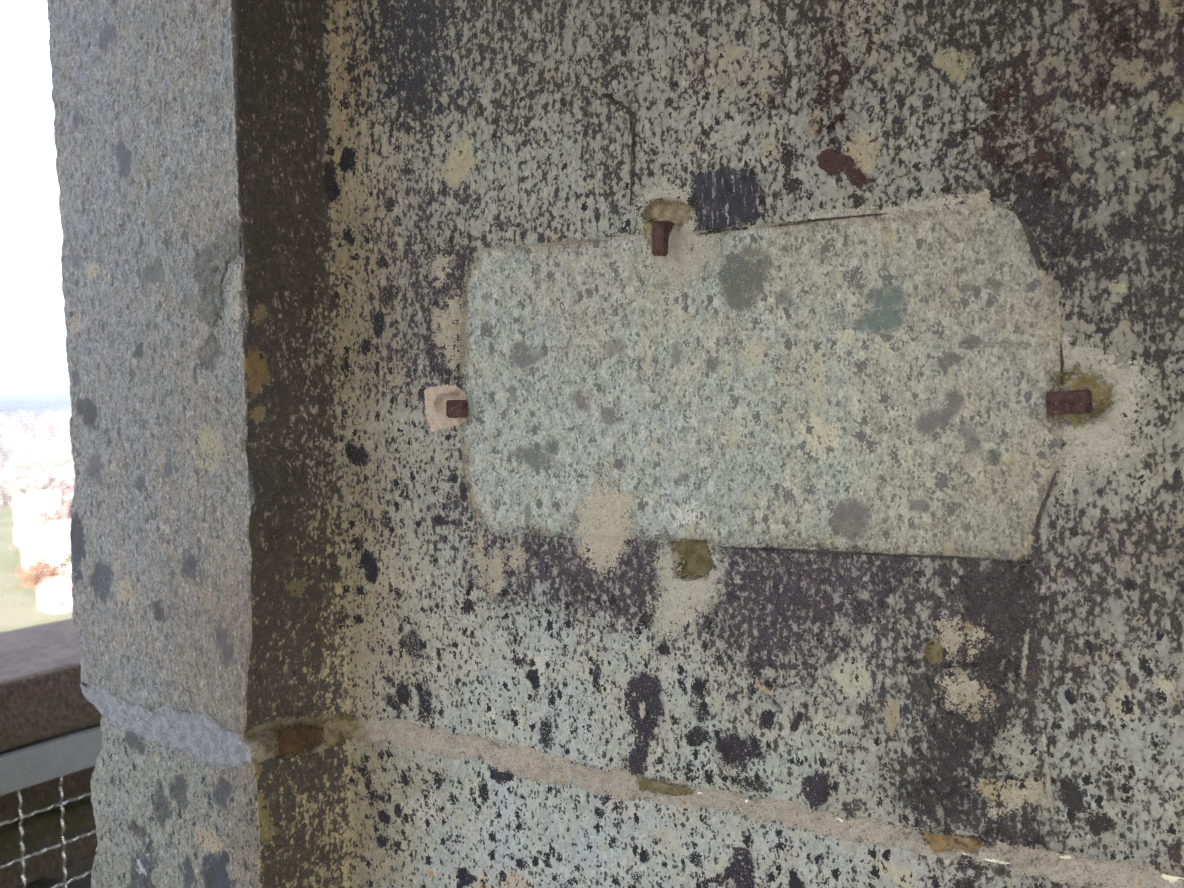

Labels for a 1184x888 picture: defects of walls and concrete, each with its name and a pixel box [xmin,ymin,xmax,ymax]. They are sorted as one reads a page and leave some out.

corrosion [1054,363,1119,428]
damp [464,526,668,624]
spalling [573,476,643,580]
spalling [641,533,735,641]
damp [708,533,910,708]